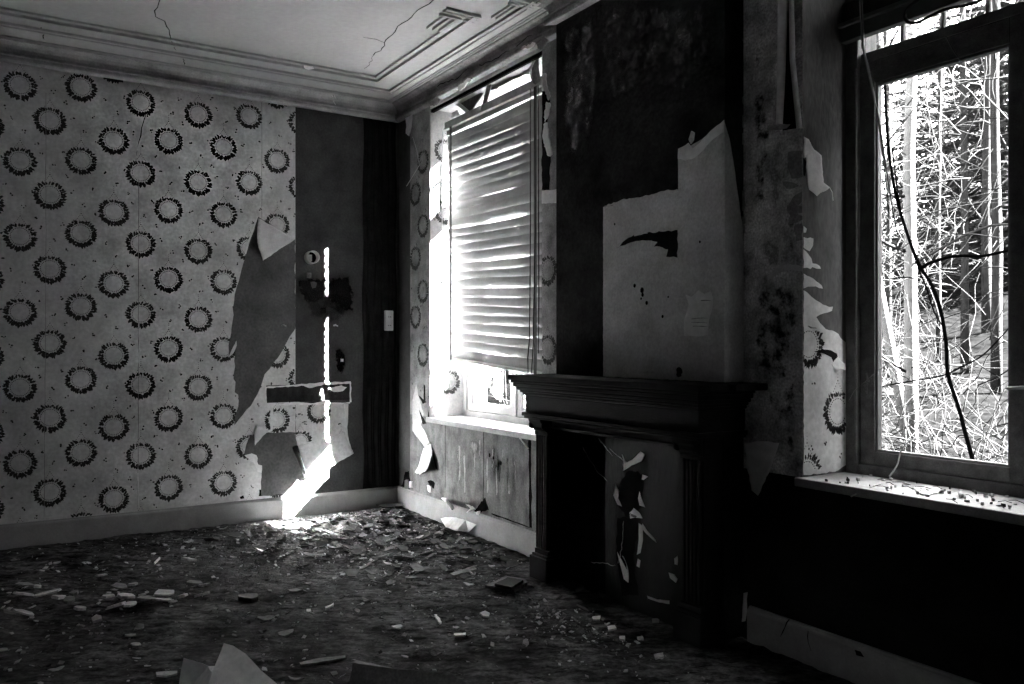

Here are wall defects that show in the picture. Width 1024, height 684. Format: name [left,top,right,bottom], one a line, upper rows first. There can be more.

crack [363,0,434,69]
flaking render [228,217,352,496]
flaking render [603,132,725,382]
water stain [756,287,795,451]